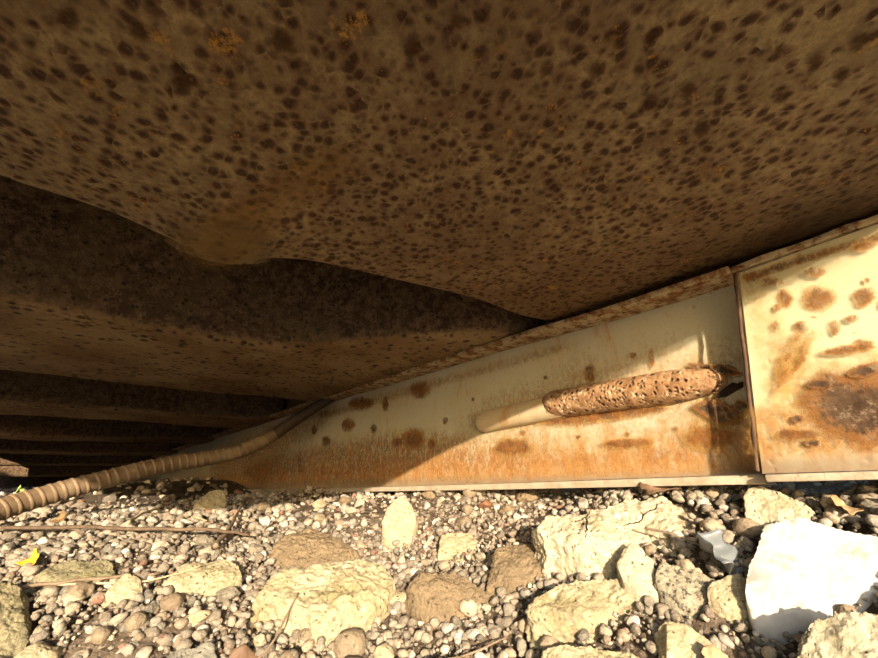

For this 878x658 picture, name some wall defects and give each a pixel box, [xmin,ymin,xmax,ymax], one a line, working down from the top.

rust [130,22,149,43]
rust [743,233,878,330]
rust [247,278,878,485]